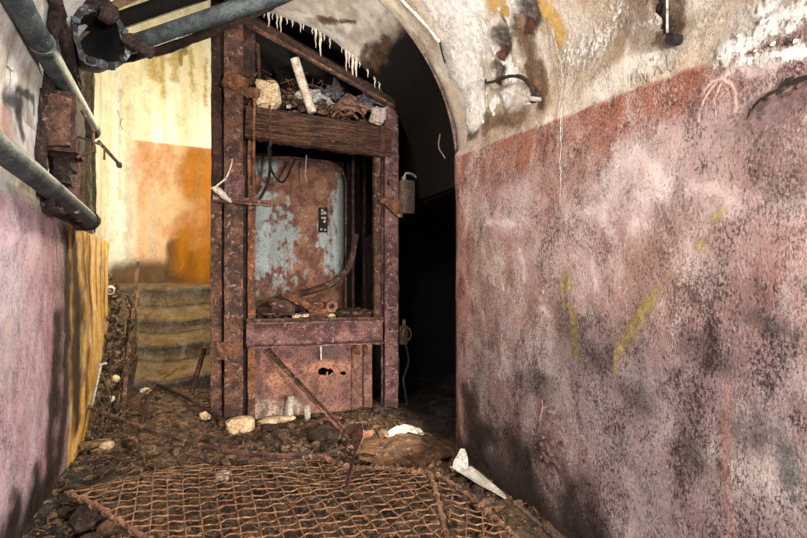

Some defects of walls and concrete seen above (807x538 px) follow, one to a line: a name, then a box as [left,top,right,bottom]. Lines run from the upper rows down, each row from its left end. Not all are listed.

water stain [151,48,194,95]
peeling [423,0,540,134]
water stain [108,92,211,284]
water stain [457,384,604,538]